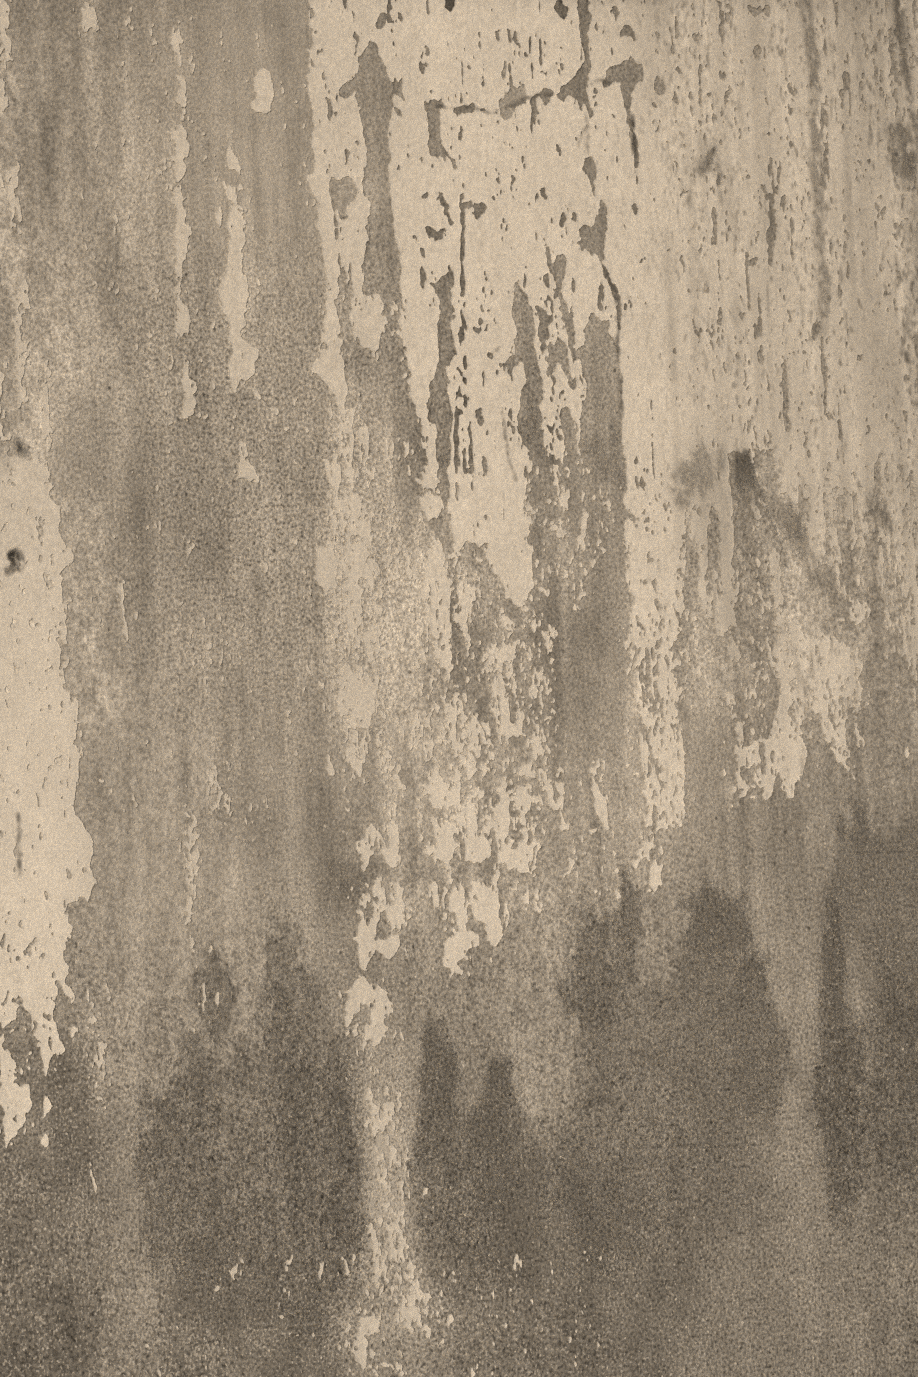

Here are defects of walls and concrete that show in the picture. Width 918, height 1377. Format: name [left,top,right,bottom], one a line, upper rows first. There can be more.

peeling [0,0,13,112]
peeling [73,0,99,37]
peeling [0,160,30,235]
peeling [0,279,120,1148]
peeling [90,558,151,641]
peeling [175,601,253,693]
peeling [241,0,918,1377]
leakage [140,934,369,1286]
leakage [411,1028,541,1269]
leakage [560,881,788,1200]
leakage [817,811,918,1225]
peeling [213,1259,244,1299]